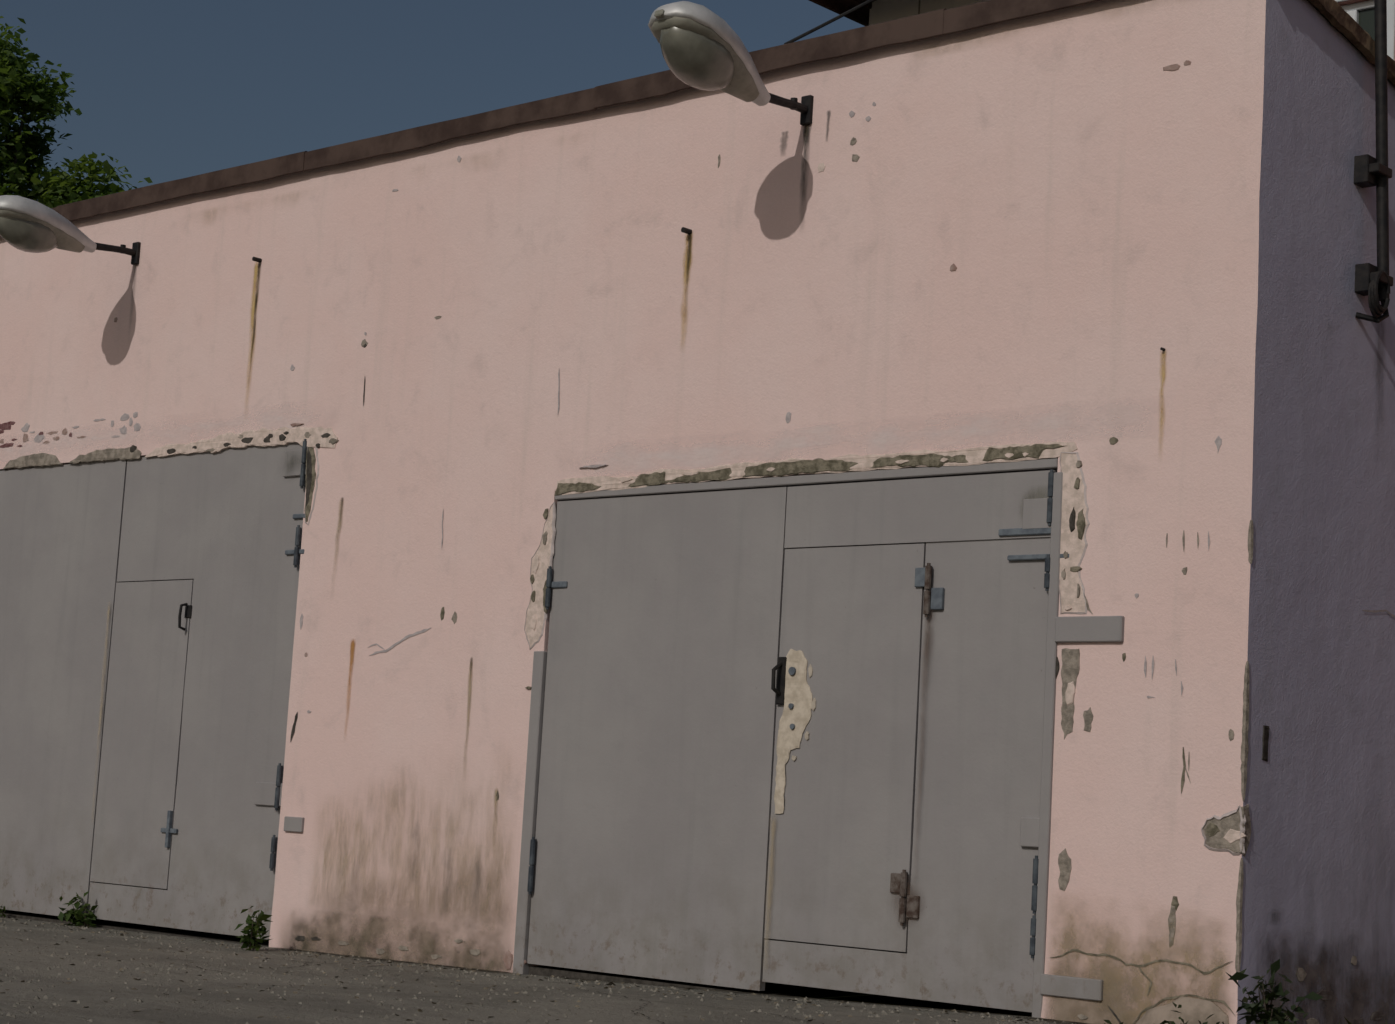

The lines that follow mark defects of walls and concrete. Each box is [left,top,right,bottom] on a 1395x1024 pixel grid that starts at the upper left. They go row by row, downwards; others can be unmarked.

water stain [802,125,810,194]
rust [251,257,262,355]
rust [681,227,692,290]
flaking render [0,412,339,525]
flaking render [524,442,1093,650]
peeling [774,649,816,814]
flaking render [1056,648,1094,739]
flaking render [1201,661,1269,972]
water stain [293,910,502,970]
water stain [1053,927,1223,1024]
crack [1050,948,1233,996]